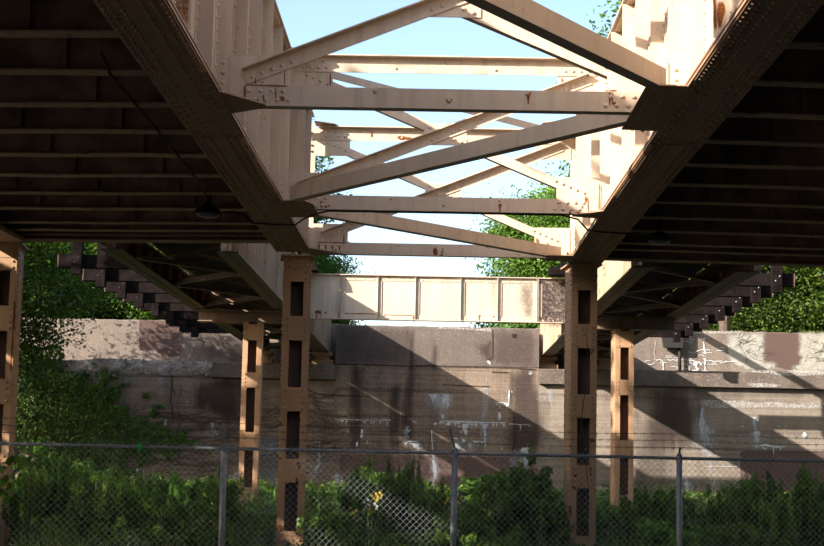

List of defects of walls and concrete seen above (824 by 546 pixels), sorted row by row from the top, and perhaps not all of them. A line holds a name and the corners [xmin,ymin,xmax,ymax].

corrosion [713,0,725,28]
spalling [88,358,212,377]
damp [335,342,420,450]
damp [428,373,538,466]
damp [752,417,786,455]